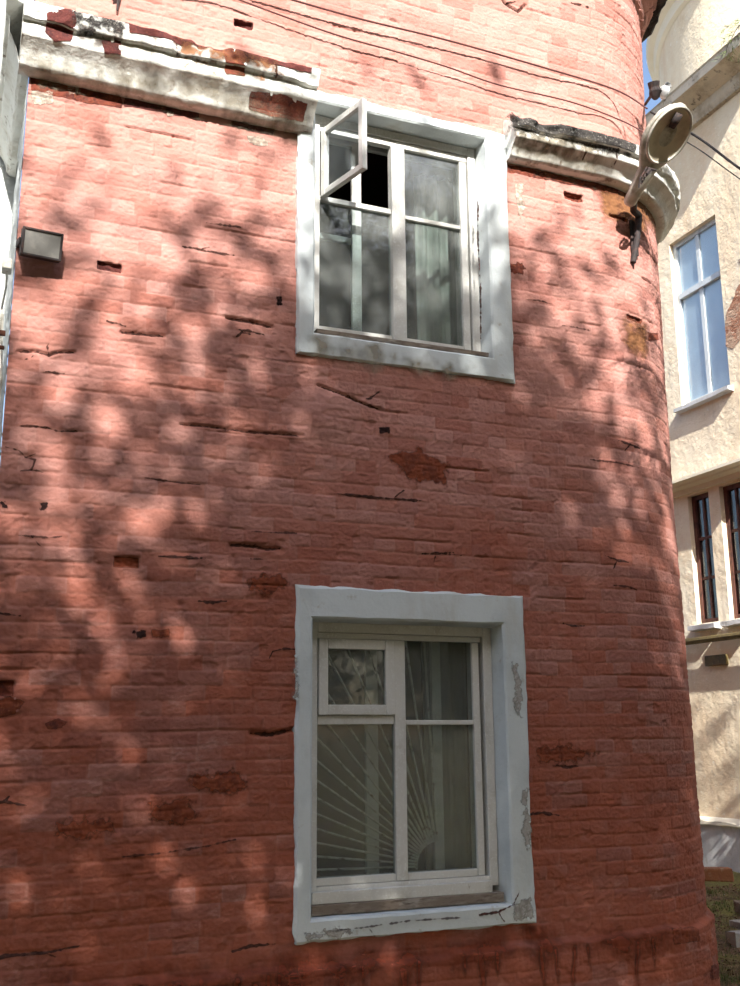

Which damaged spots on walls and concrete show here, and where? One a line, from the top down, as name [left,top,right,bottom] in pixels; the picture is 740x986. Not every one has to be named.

spalling [45,8,77,42]
spalling [234,19,253,30]
spalling [102,36,124,55]
flaking render [129,23,312,76]
flaking render [31,77,199,118]
flaking render [231,91,307,146]
spalling [626,314,659,341]
flaking render [725,284,740,348]
spalling [388,447,450,485]
peeling [305,928,353,941]
damp [140,931,669,986]